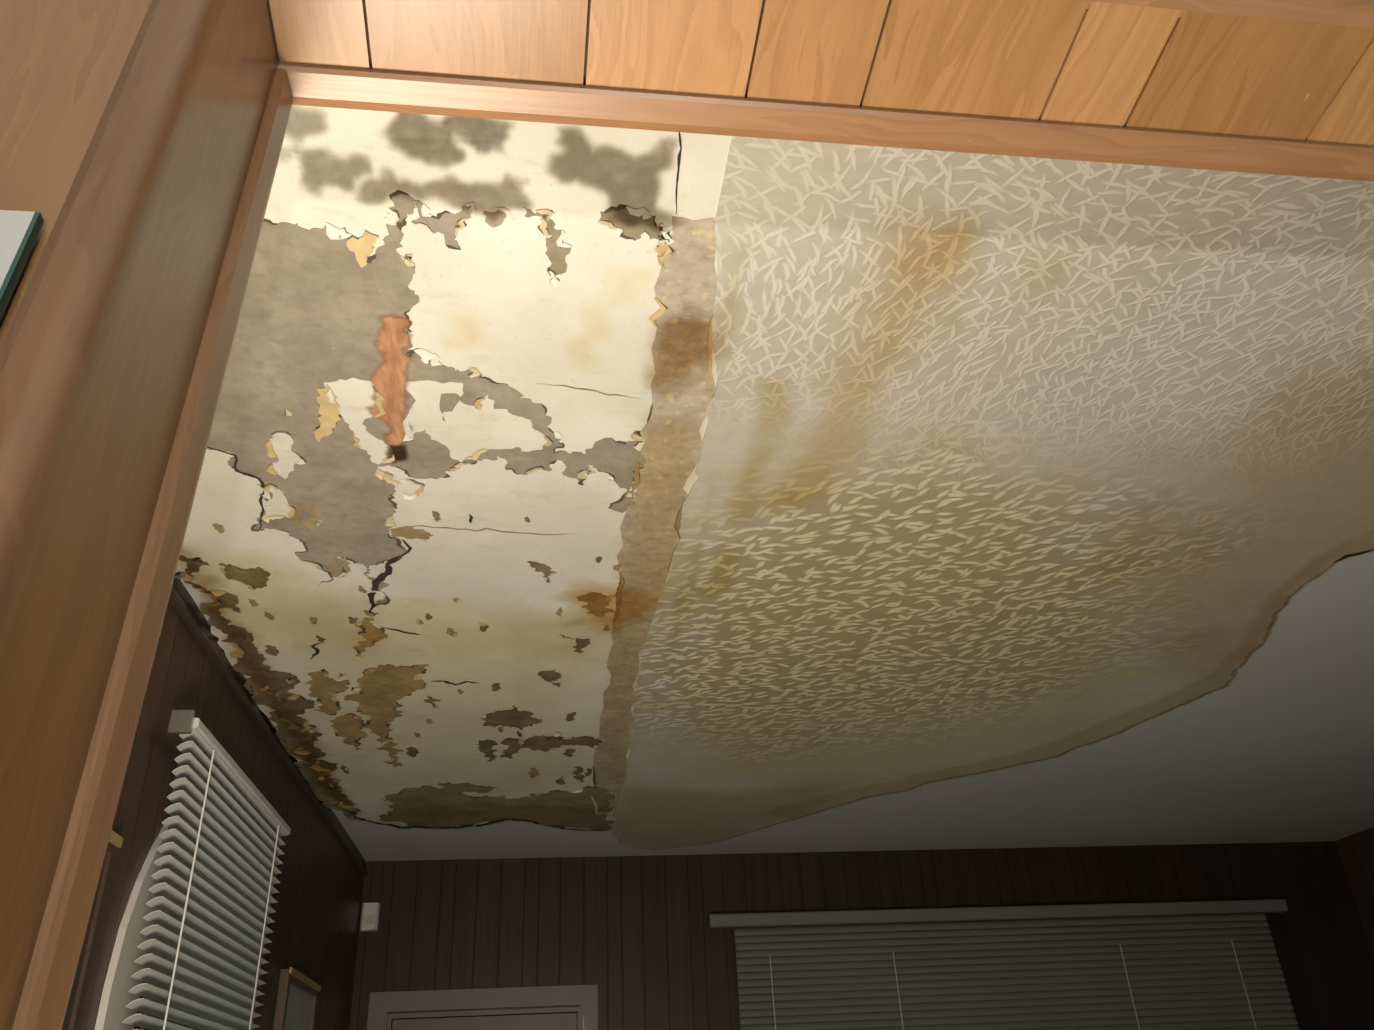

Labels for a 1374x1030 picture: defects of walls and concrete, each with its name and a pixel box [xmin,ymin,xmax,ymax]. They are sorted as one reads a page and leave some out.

peeling [174,191,717,830]
crack [367,515,577,635]